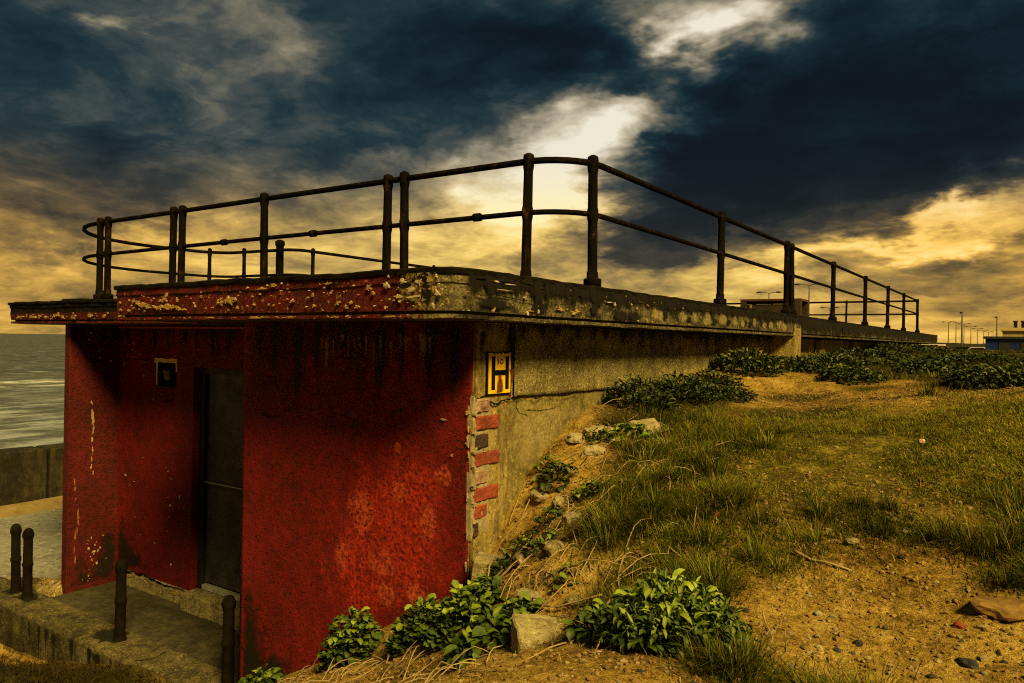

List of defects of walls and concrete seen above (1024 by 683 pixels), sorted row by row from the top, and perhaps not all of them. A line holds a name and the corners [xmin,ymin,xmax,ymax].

peeling [16,272,450,320]
peeling [523,296,589,319]
leakage [469,272,938,353]
leakage [256,322,489,397]
crack [477,392,576,416]
flaking render [465,396,500,541]
peeling [73,479,107,564]